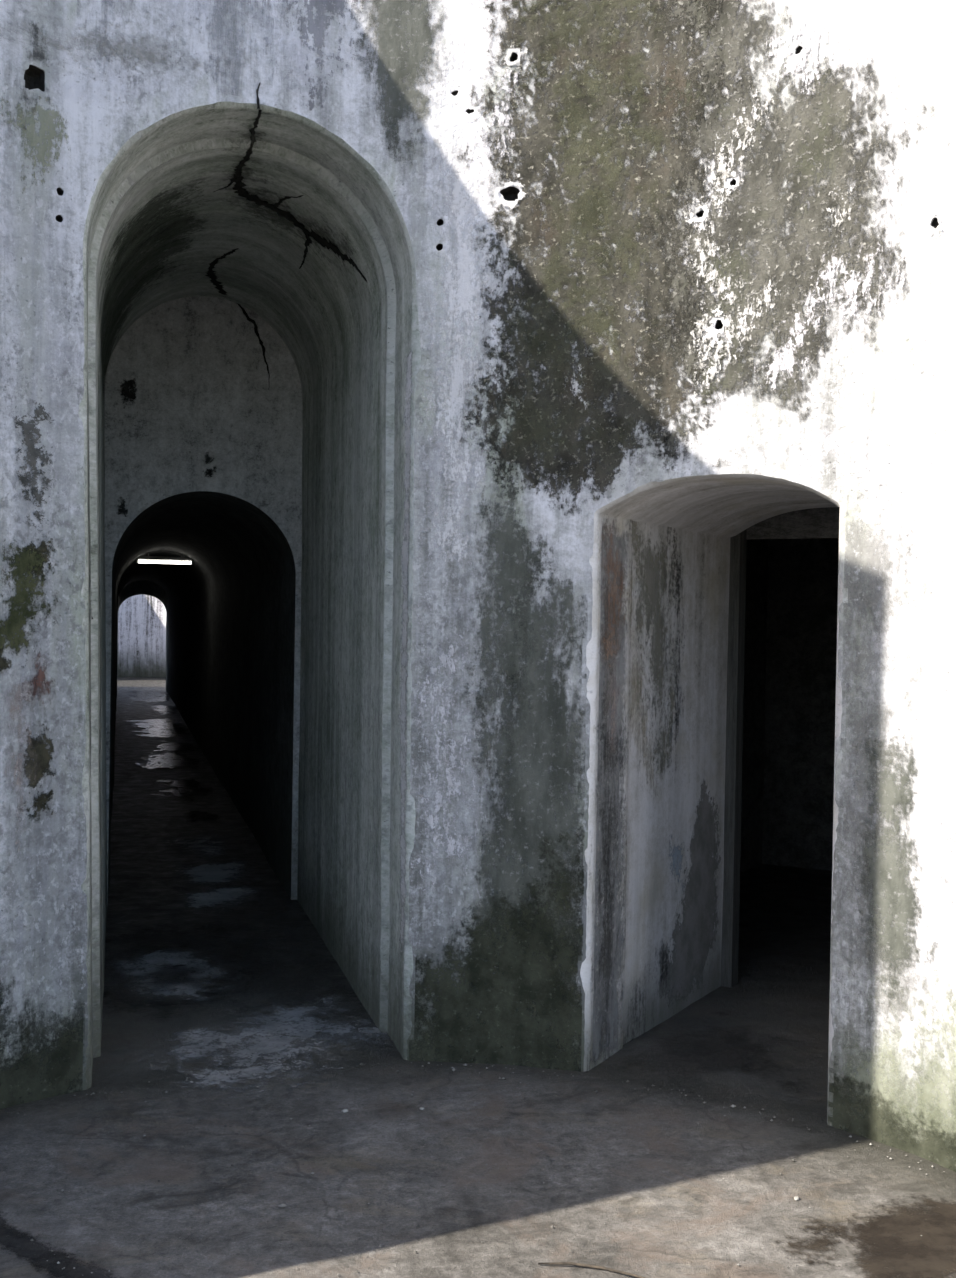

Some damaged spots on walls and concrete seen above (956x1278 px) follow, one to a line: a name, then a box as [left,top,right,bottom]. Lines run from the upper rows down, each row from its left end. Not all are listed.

spalling [16,54,54,103]
crack [214,82,367,282]
crack [205,248,270,378]
water stain [262,0,683,1070]
water stain [88,377,102,976]
water stain [837,523,934,1019]
water stain [161,834,260,912]
water stain [0,978,85,1064]
water stain [118,950,233,1000]
water stain [142,994,393,1101]
water stain [776,1194,956,1278]